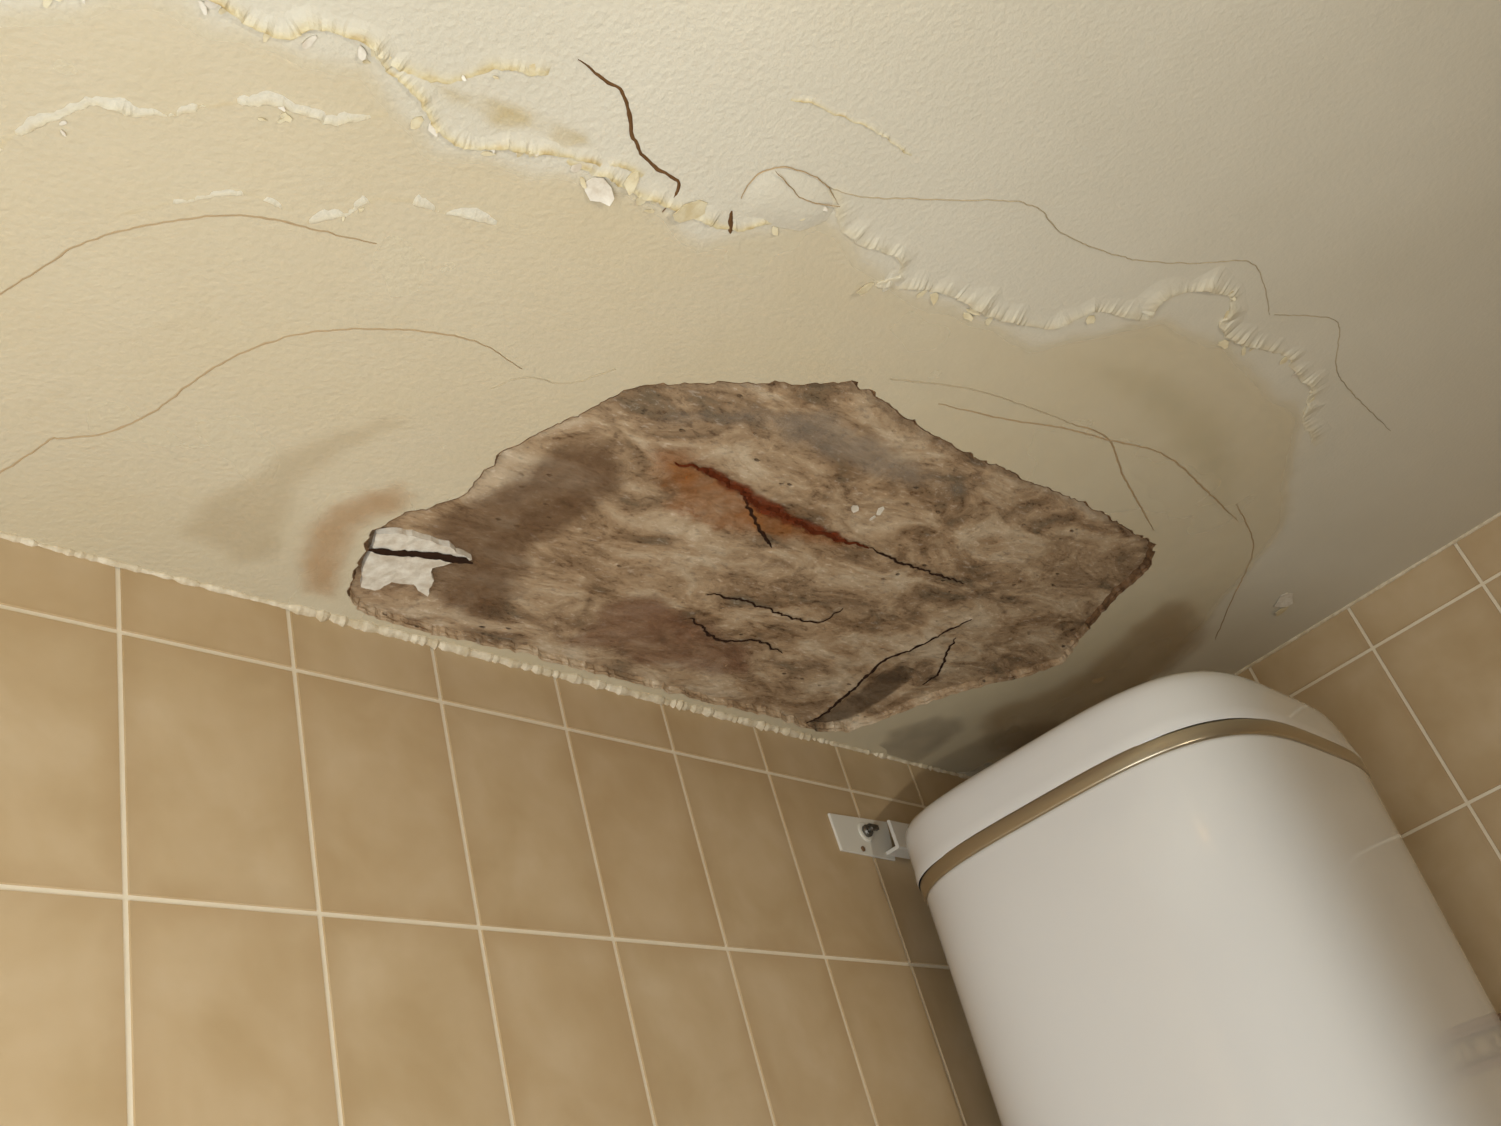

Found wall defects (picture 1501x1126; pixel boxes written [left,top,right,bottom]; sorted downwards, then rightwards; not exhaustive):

peeling [0,88,389,151]
peeling [198,0,778,236]
crack [578,59,681,213]
crack [0,214,377,295]
crack [726,211,734,234]
peeling [823,181,1332,447]
crack [0,328,615,473]
water stain [444,453,616,610]
flaking render [347,380,1157,733]
crack [688,593,843,654]
corrosion [670,462,869,549]
crack [806,619,972,723]